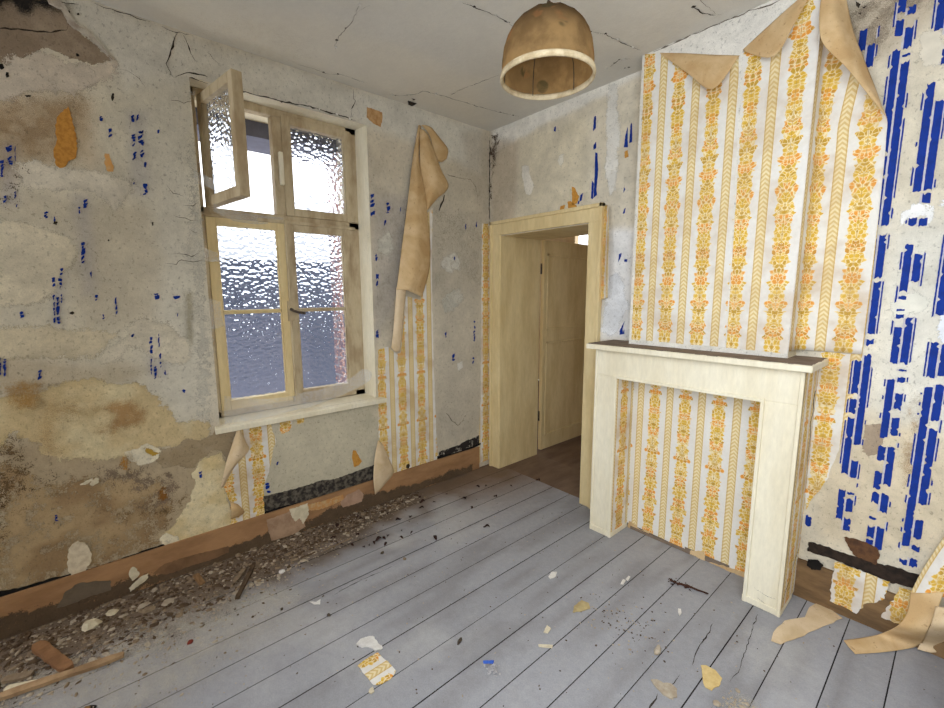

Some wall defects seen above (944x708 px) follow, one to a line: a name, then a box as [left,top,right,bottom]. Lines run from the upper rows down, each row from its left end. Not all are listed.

crack [0,26,68,34]
flaking render [0,0,113,77]
crack [62,2,218,103]
flaking render [862,424,884,456]
water stain [0,379,187,591]
flaking render [124,431,236,545]
peeling [129,546,229,592]
flaking render [844,537,880,565]